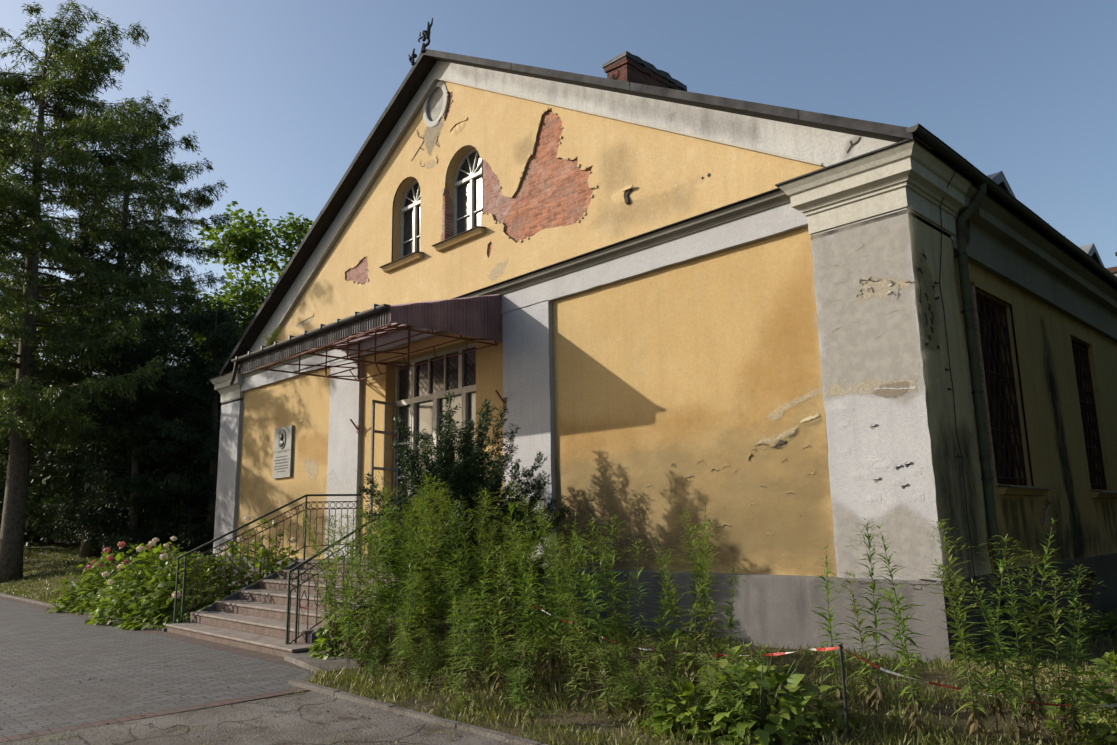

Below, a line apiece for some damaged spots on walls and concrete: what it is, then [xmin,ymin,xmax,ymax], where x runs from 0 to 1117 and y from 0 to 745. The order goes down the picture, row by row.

spalling [420,90,472,241]
spalling [481,107,598,243]
spalling [345,256,369,284]
peeling [487,241,505,278]
peeling [769,381,916,419]
spalling [1021,570,1096,634]